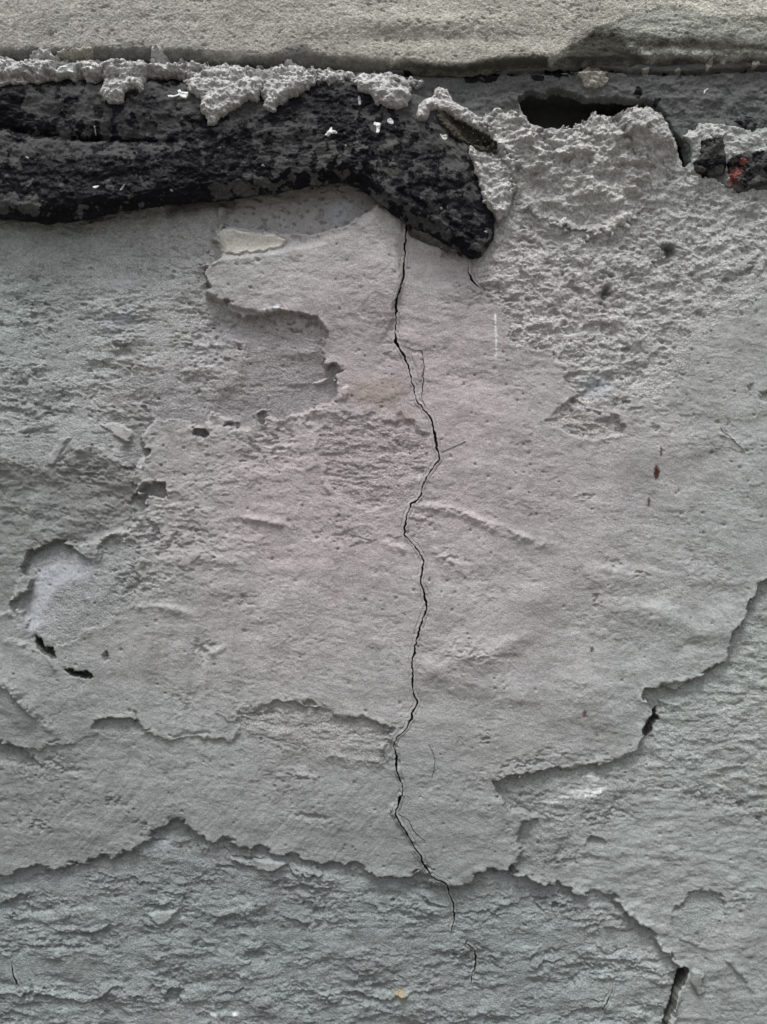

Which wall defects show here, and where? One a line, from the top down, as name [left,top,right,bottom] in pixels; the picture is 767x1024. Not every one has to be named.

spalling [55,62,79,79]
spalling [0,201,430,511]
crack [465,259,491,298]
spalling [515,115,567,134]
spalling [400,123,767,441]
spalling [9,534,142,645]
crack [380,223,479,990]
spalling [0,579,767,1024]